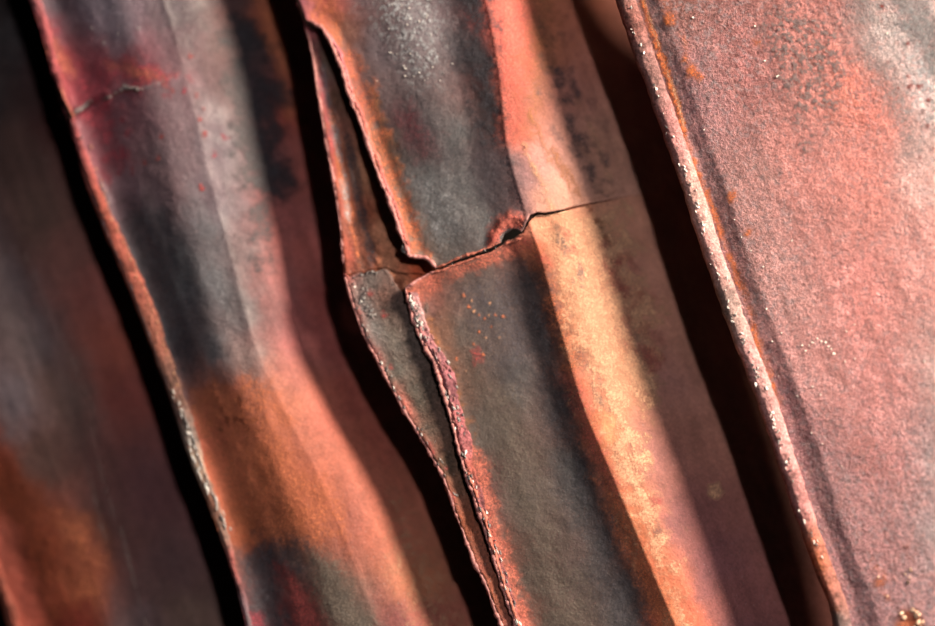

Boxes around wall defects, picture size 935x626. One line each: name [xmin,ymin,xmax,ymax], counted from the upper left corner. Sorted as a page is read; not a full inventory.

crack [52,76,169,208]
corrosion [39,24,186,184]
corrosion [306,0,432,266]
crack [343,242,502,289]
corrosion [482,0,541,140]
crack [526,199,617,237]
corrosion [639,0,749,296]
corrosion [755,0,855,154]
corrosion [344,276,503,626]
corrosion [407,203,692,626]